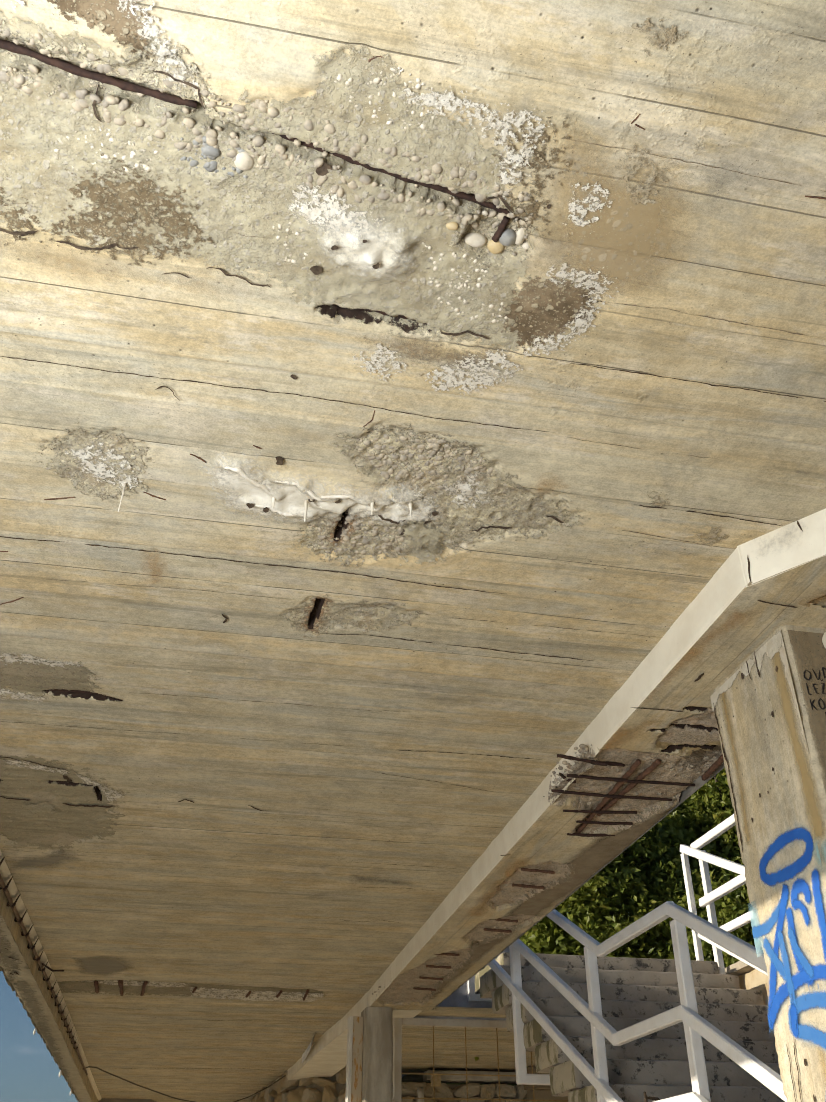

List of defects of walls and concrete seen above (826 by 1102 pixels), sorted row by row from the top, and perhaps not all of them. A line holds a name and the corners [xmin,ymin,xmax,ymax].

crack [0,39,205,122]
damp [47,0,199,90]
damp [0,148,224,275]
spalling [0,11,543,352]
crack [272,133,520,220]
damp [353,83,668,396]
crack [317,304,489,339]
spalling [35,422,155,512]
spalling [290,421,591,568]
spalling [0,652,123,703]
spalling [543,629,810,839]
spalling [0,755,129,853]